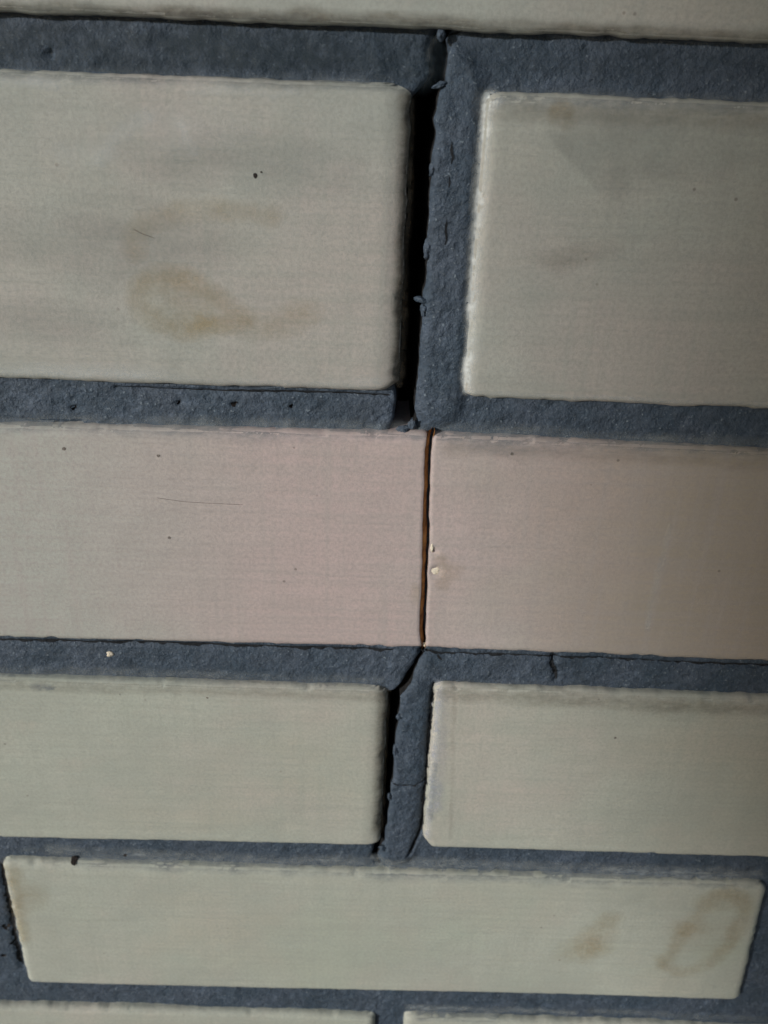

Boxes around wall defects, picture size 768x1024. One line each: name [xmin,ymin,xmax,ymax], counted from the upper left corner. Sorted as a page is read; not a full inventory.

crack [121,29,768,863]